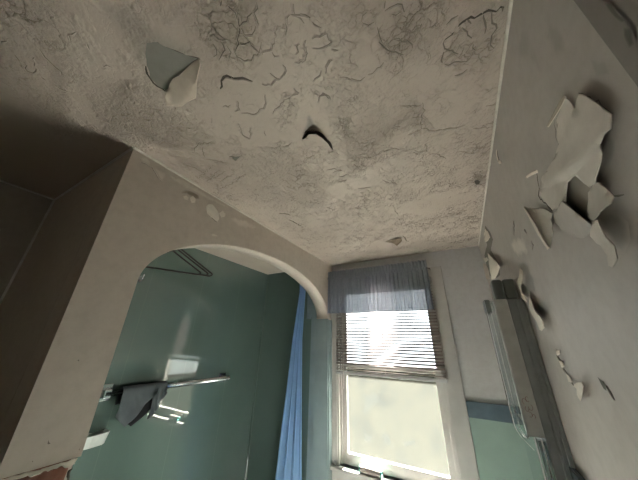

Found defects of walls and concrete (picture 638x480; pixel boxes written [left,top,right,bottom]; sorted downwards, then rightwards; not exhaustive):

peeling [145,42,200,107]
crack [213,0,338,139]
crack [340,12,413,82]
crack [420,2,508,78]
peeling [301,113,333,152]
crack [392,103,487,159]
peeling [524,93,638,267]
peeling [483,226,500,279]
peeling [514,268,549,331]
spalling [556,349,584,401]